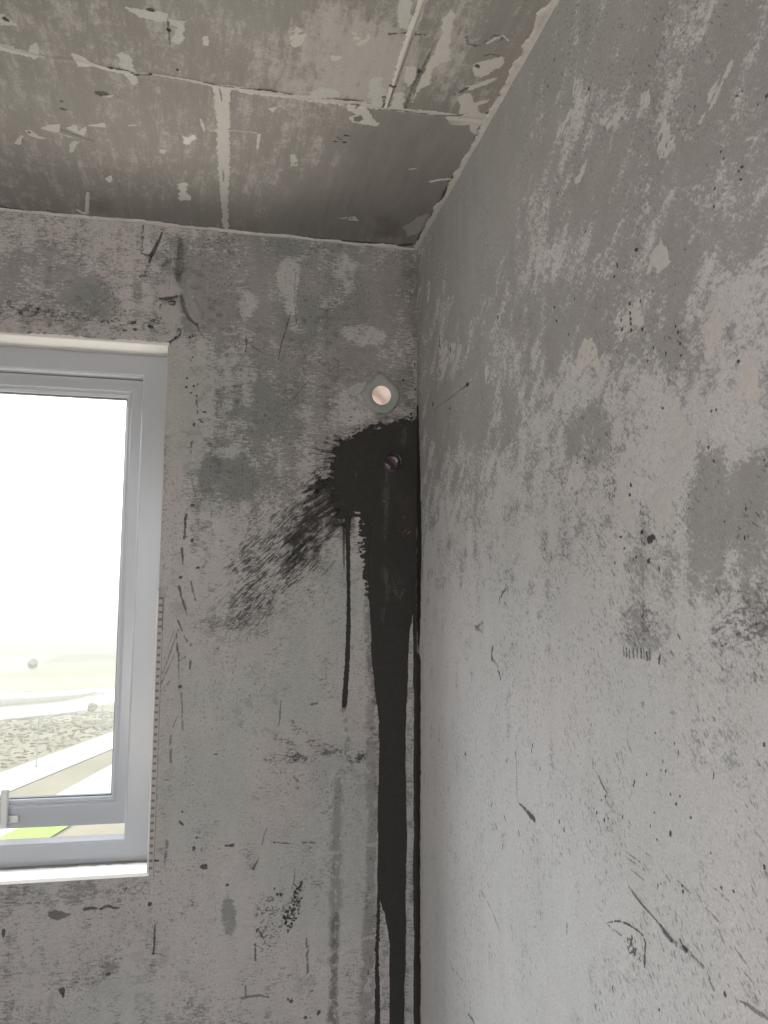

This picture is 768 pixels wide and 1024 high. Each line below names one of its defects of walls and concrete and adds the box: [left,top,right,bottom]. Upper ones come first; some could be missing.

flaking render [125,7,188,44]
flaking render [309,86,380,126]
flaking render [445,56,505,136]
flaking render [14,123,106,153]
crack [139,225,163,278]
leakage [288,405,422,1024]